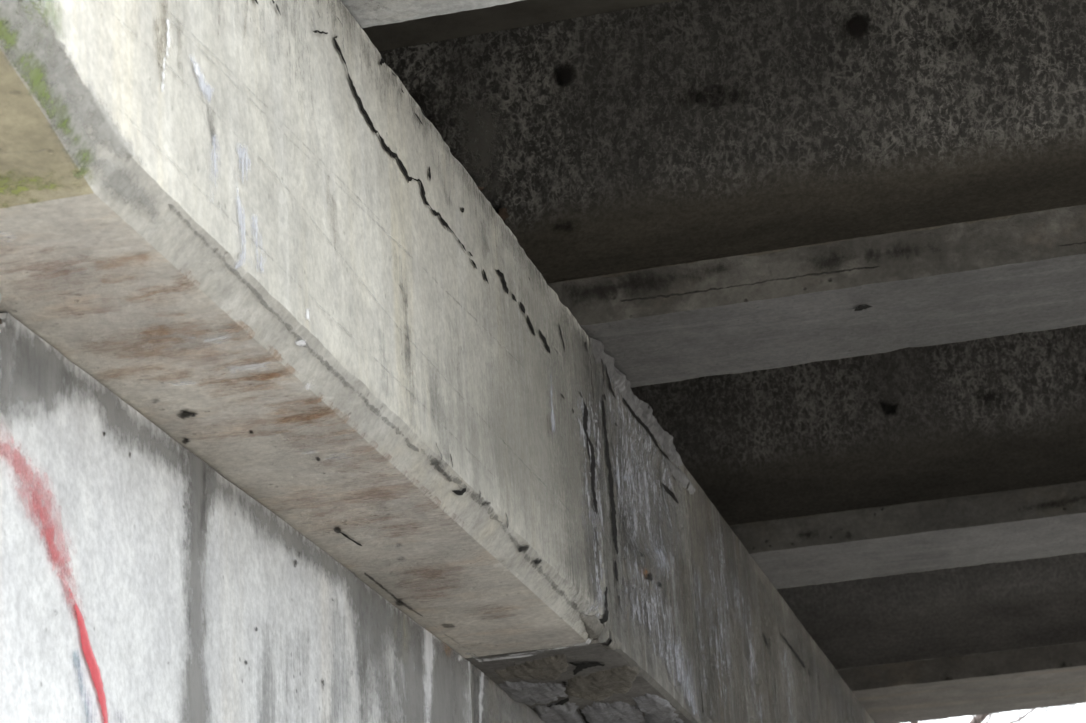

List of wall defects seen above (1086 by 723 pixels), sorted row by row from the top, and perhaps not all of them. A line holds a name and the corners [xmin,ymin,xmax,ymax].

crack [313,17,679,624]
crack [621,266,878,302]
water stain [0,319,591,723]
crack [547,662,605,723]
peeling [499,681,684,723]
water stain [577,378,763,717]